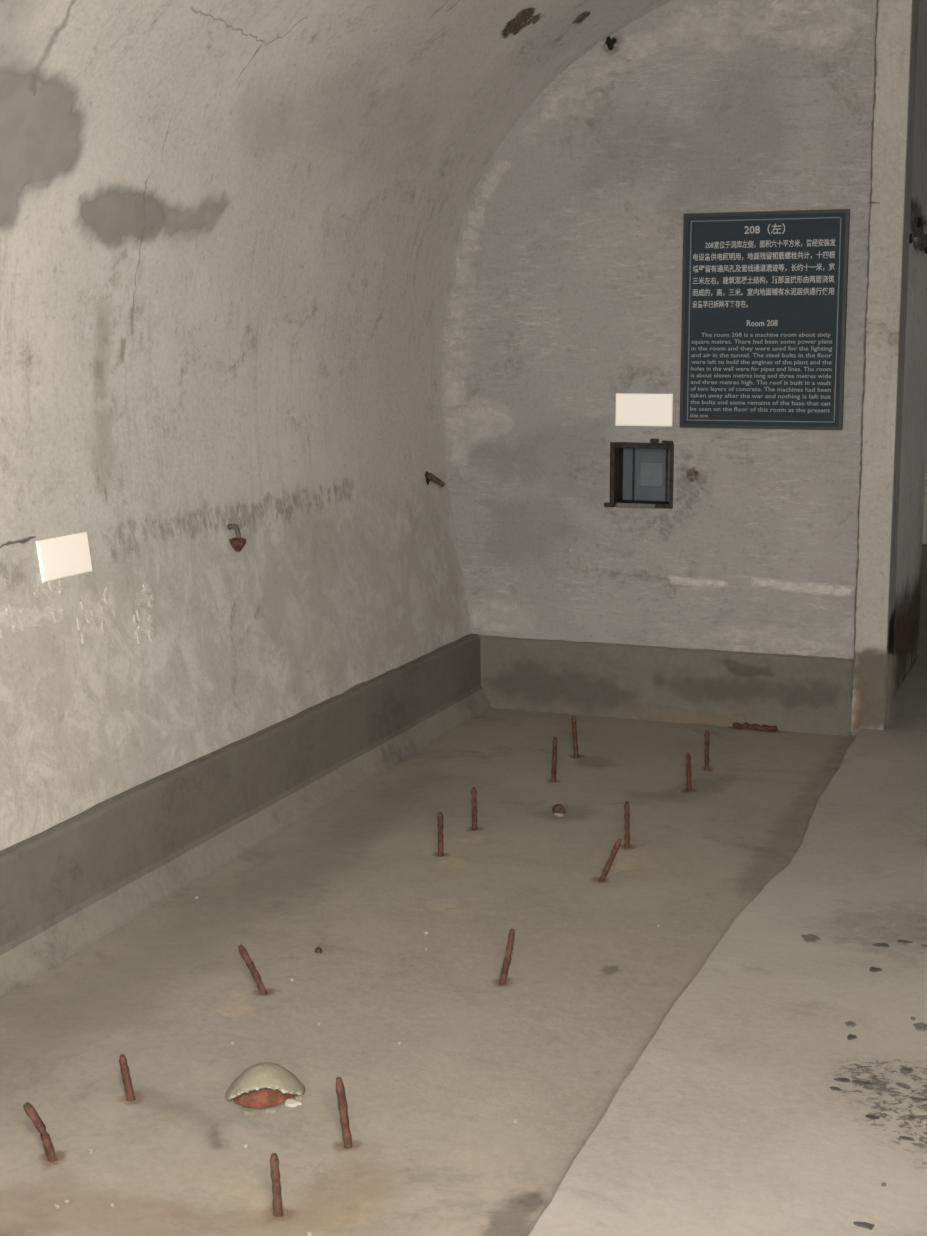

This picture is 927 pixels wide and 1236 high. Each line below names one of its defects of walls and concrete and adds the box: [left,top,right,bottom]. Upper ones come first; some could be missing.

spalling [501,8,540,38]
water stain [0,71,81,227]
water stain [80,189,226,245]